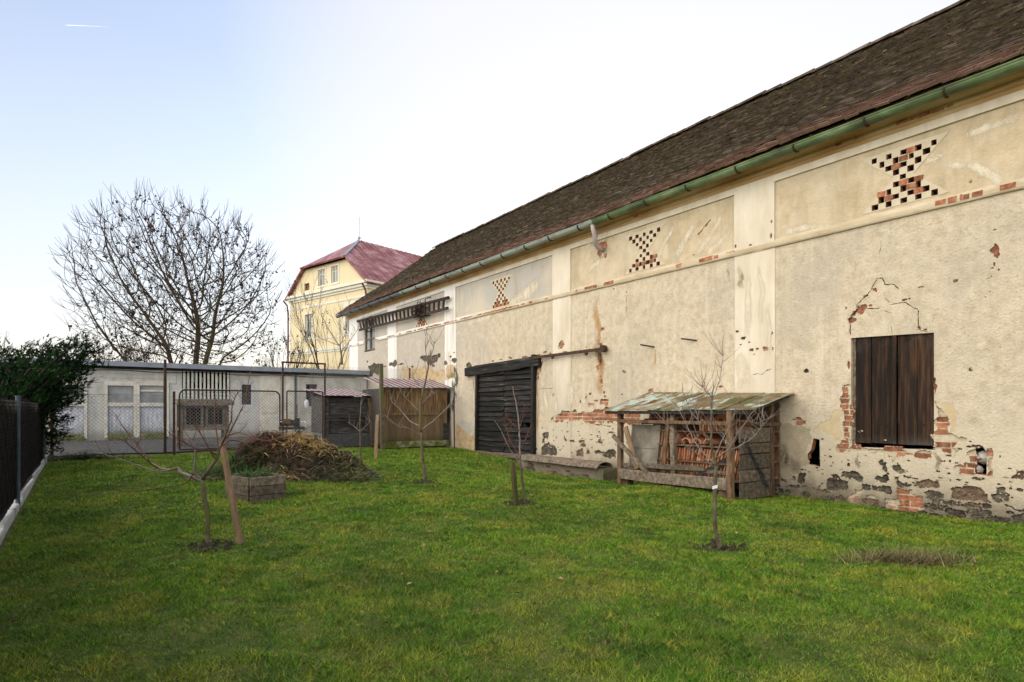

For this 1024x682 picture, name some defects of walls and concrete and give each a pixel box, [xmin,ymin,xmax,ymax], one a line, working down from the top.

corrosion [582,296,605,395]
crack [849,278,928,335]
spalling [987,243,1000,293]
spalling [539,364,641,459]
spalling [775,378,1024,525]